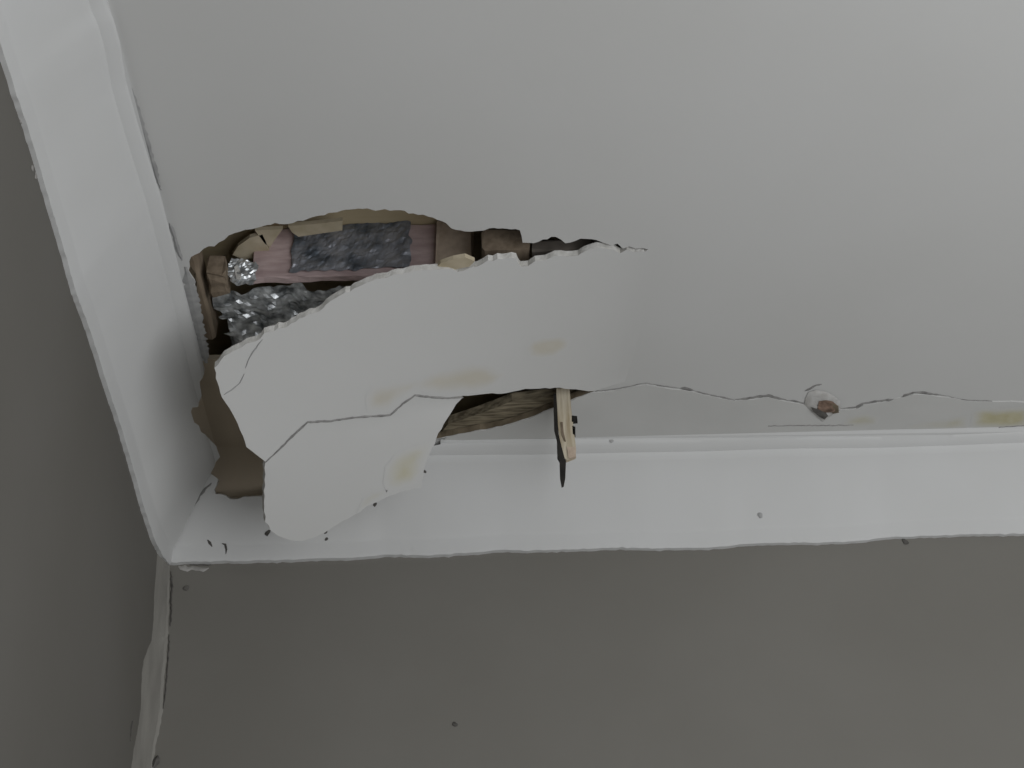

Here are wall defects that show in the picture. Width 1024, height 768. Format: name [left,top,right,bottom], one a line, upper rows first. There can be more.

flaking render [214,242,652,541]
crack [595,383,992,427]